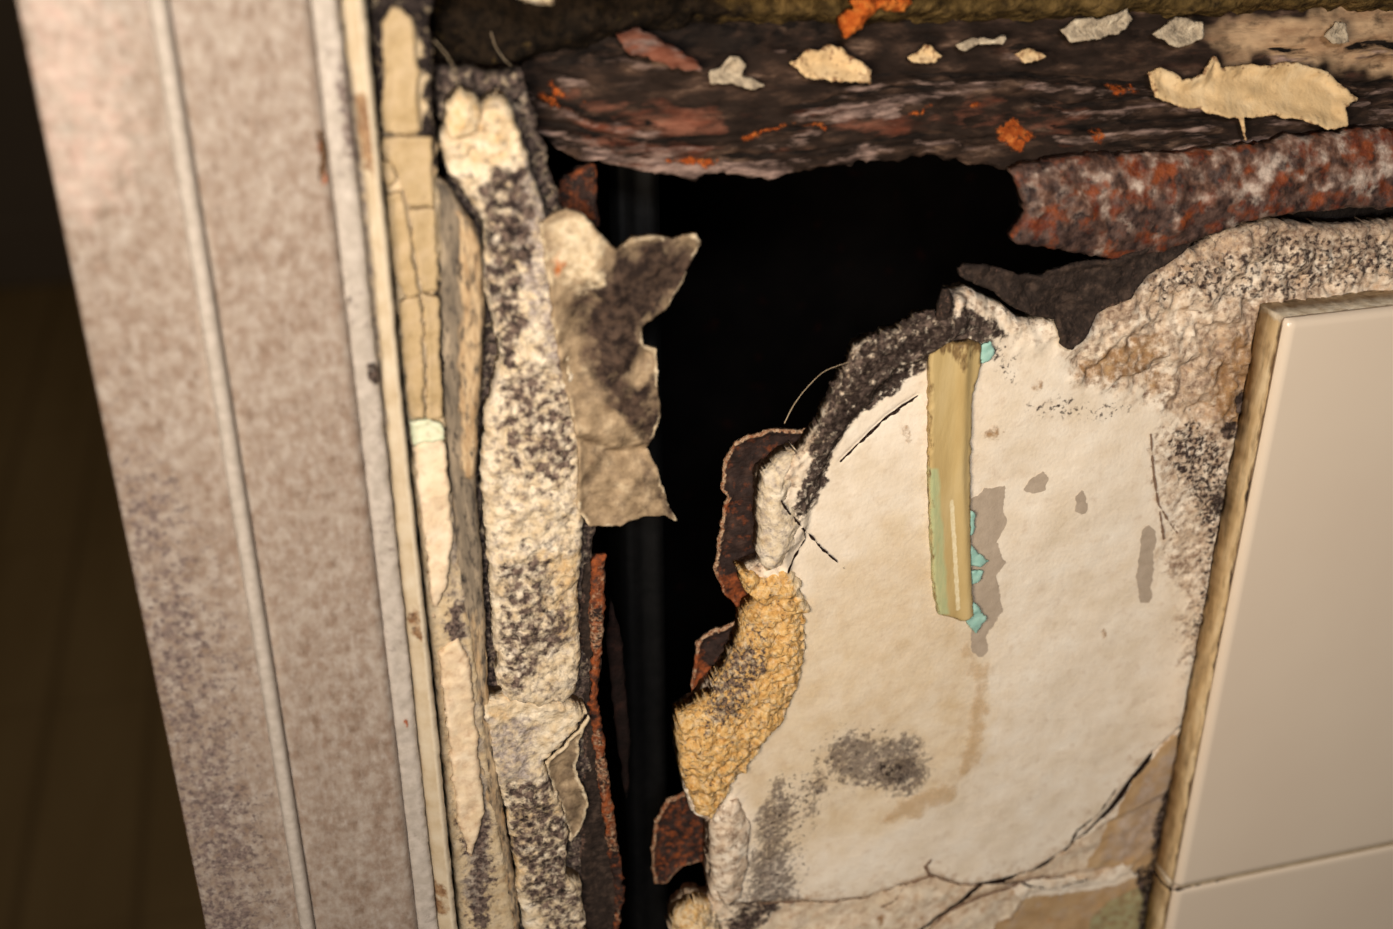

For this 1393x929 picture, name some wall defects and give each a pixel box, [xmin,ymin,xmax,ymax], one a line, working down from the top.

peeling [789,44,872,84]
peeling [1060,9,1133,43]
peeling [1147,56,1358,141]
peeling [380,5,445,446]
corrosion [998,119,1393,259]
leakage [367,363,380,384]
corrosion [690,426,807,692]
spalling [659,154,1105,819]
corrosion [578,551,625,929]
corrosion [650,791,704,884]
crack [750,752,1152,929]
peeling [994,735,1178,929]